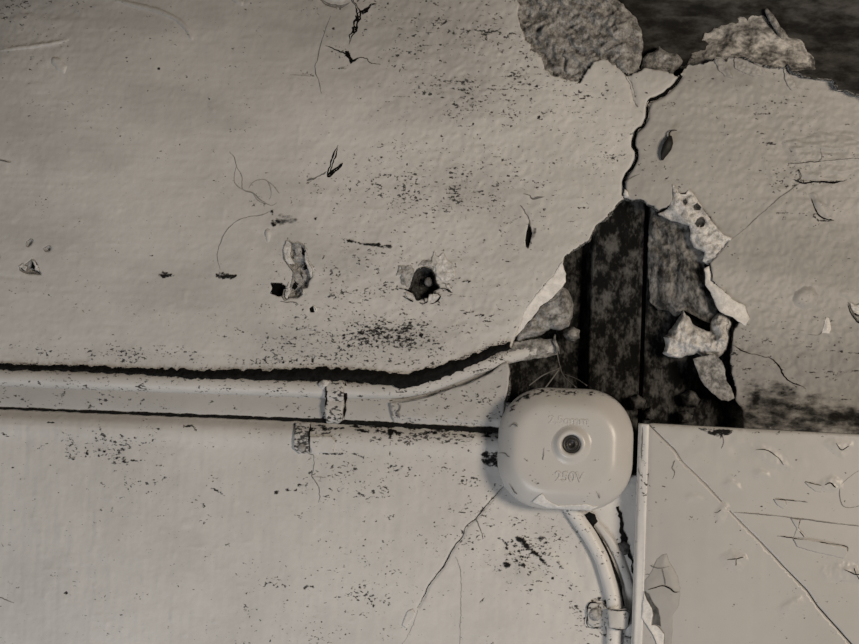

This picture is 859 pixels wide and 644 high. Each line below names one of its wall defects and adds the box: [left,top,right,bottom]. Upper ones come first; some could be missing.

crack [297,0,375,94]
flaking render [517,0,643,83]
crack [623,73,683,198]
peeling [781,131,859,221]
flaking render [19,260,41,275]
flaking render [280,240,314,304]
flaking render [516,261,574,342]
flaking render [658,185,750,326]
flaking render [693,354,734,401]
crack [735,471,858,526]
crack [402,490,500,644]
peeling [642,553,681,644]